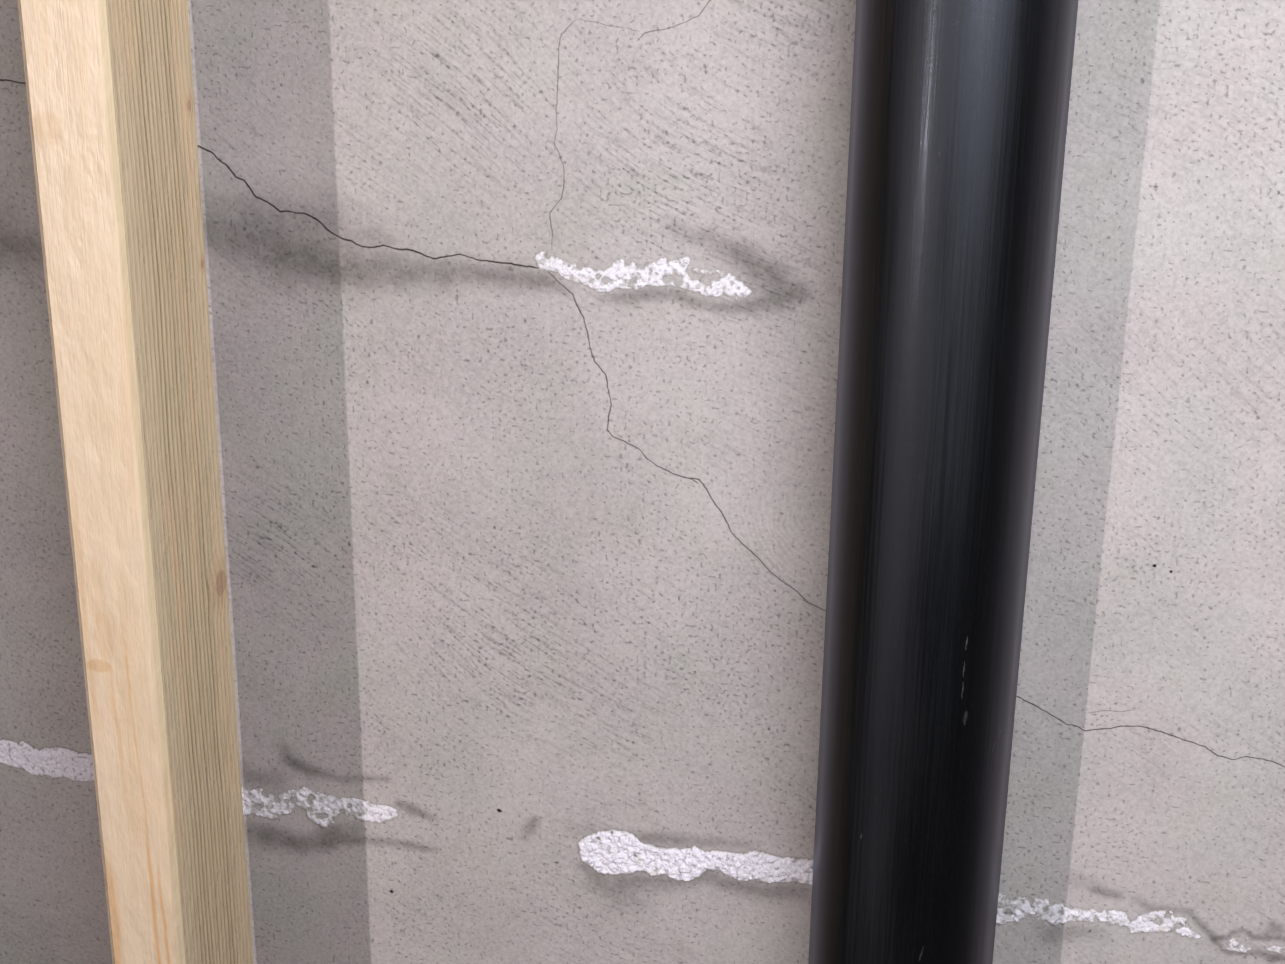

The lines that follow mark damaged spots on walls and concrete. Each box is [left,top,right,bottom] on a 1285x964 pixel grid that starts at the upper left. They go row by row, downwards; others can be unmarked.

leakage [534,251,752,301]
crack [197,145,826,611]
crack [1017,696,1284,767]
leakage [0,739,95,782]
leakage [242,785,399,828]
leakage [577,829,813,885]
leakage [996,893,1202,939]
leakage [1223,937,1285,959]